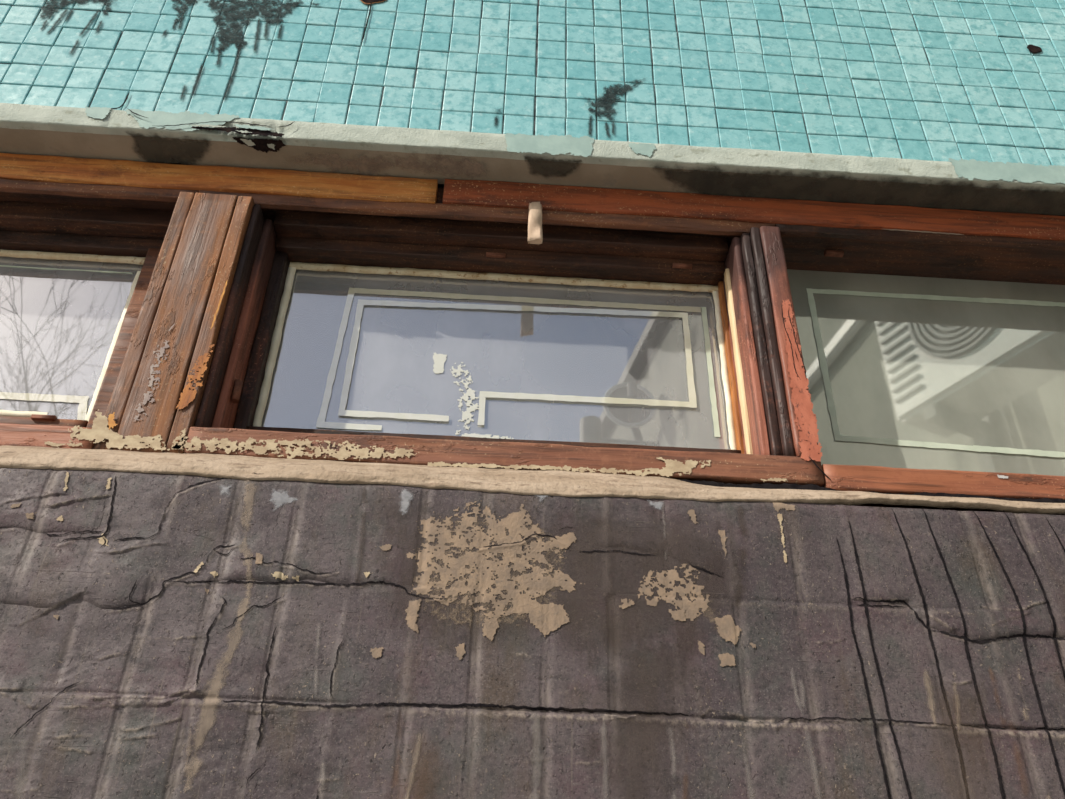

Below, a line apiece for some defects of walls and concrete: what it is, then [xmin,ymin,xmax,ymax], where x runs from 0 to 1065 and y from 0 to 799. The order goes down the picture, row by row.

leakage [223,45,241,99]
leakage [130,134,210,165]
peeling [126,108,295,153]
leakage [525,156,581,177]
leakage [655,167,1065,216]
peeling [45,409,419,461]
crack [681,457,836,491]
crack [43,476,223,548]
peeling [405,501,585,640]
peeling [619,564,756,667]
crack [109,543,688,787]
crack [777,491,1065,799]